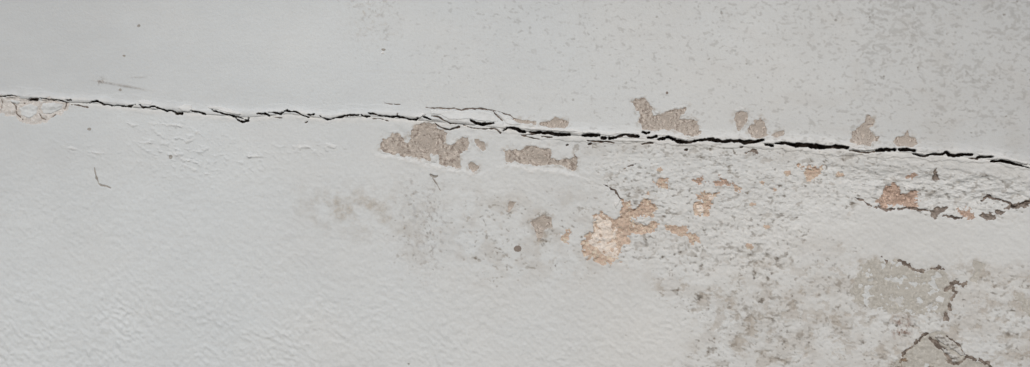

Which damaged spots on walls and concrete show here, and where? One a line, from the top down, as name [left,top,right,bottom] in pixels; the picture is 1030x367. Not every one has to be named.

flaking render [0,95,89,125]
peeling [380,107,578,172]
crack [3,95,1029,199]
peeling [631,97,702,137]
peeling [734,111,785,155]
peeling [850,115,880,146]
peeling [893,130,918,147]
flaking render [530,167,701,266]
flaking render [692,175,742,217]
crack [855,194,1030,220]
flaking render [875,173,1030,221]
peeling [849,256,992,367]